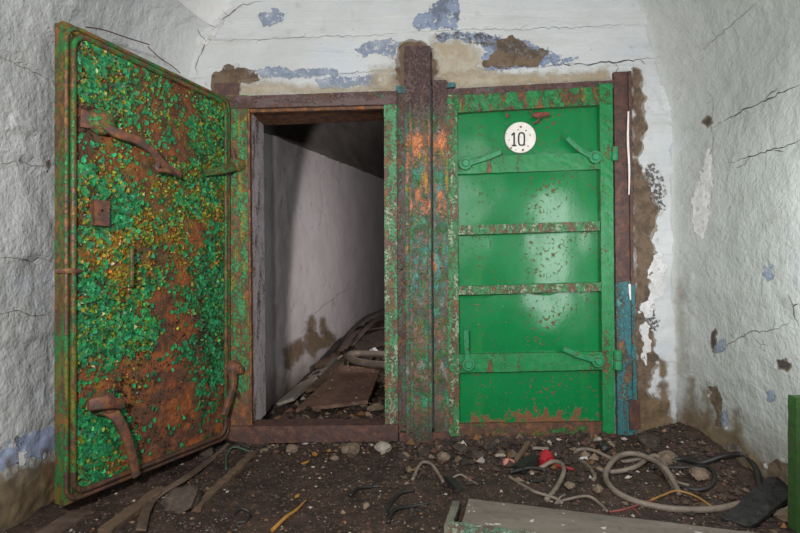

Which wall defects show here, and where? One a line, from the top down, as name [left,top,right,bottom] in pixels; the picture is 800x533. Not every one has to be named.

peeling [355,0,579,86]
crack [707,85,799,168]
peeling [73,41,381,492]
flaking render [632,67,667,400]
leakage [284,316,336,369]
crack [724,295,799,350]
peeling [0,425,55,471]
corrosion [628,397,640,430]
leakage [637,360,763,473]